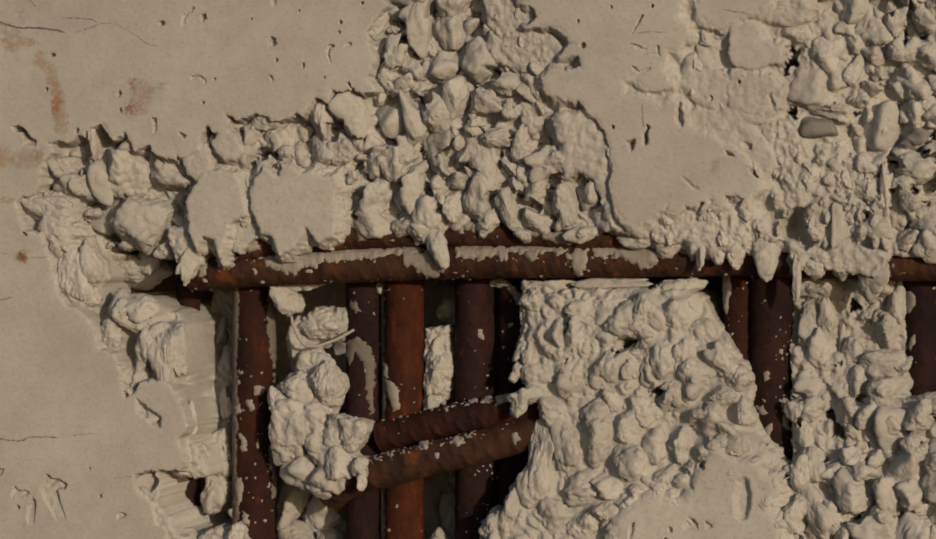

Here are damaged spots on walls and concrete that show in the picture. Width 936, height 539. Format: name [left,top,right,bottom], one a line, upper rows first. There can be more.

crack [0,17,103,32]
spalling [9,123,39,150]
spalling [91,220,862,539]
spalling [879,256,936,396]